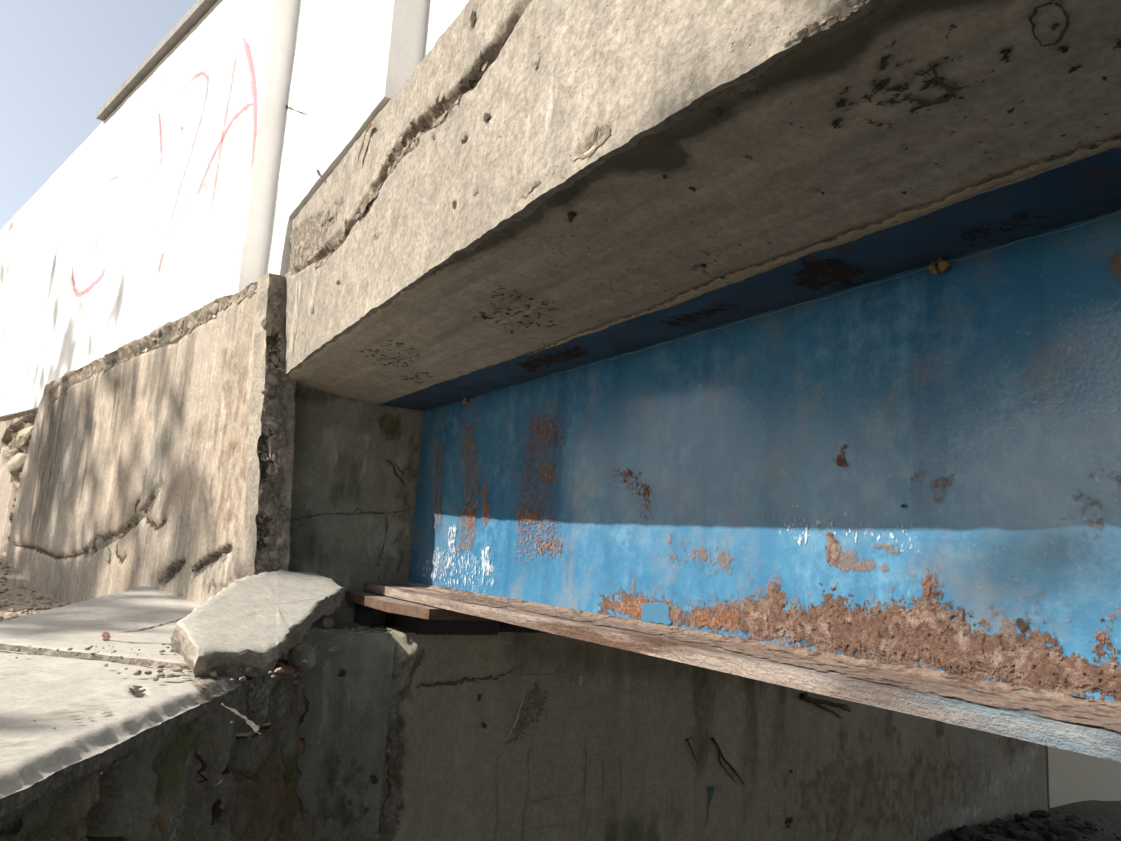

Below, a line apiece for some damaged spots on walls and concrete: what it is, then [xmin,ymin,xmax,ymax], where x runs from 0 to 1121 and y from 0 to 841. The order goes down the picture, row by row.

spalling [355,184,379,220]
flaking render [357,103,378,164]
crack [296,5,528,273]
spalling [0,282,257,488]
spalling [254,197,344,575]
crack [7,483,167,564]
corrosion [456,415,492,551]
corrosion [511,395,570,571]
corrosion [668,533,733,573]
corrosion [825,532,888,571]
crack [415,662,681,689]
corrosion [449,573,1121,732]